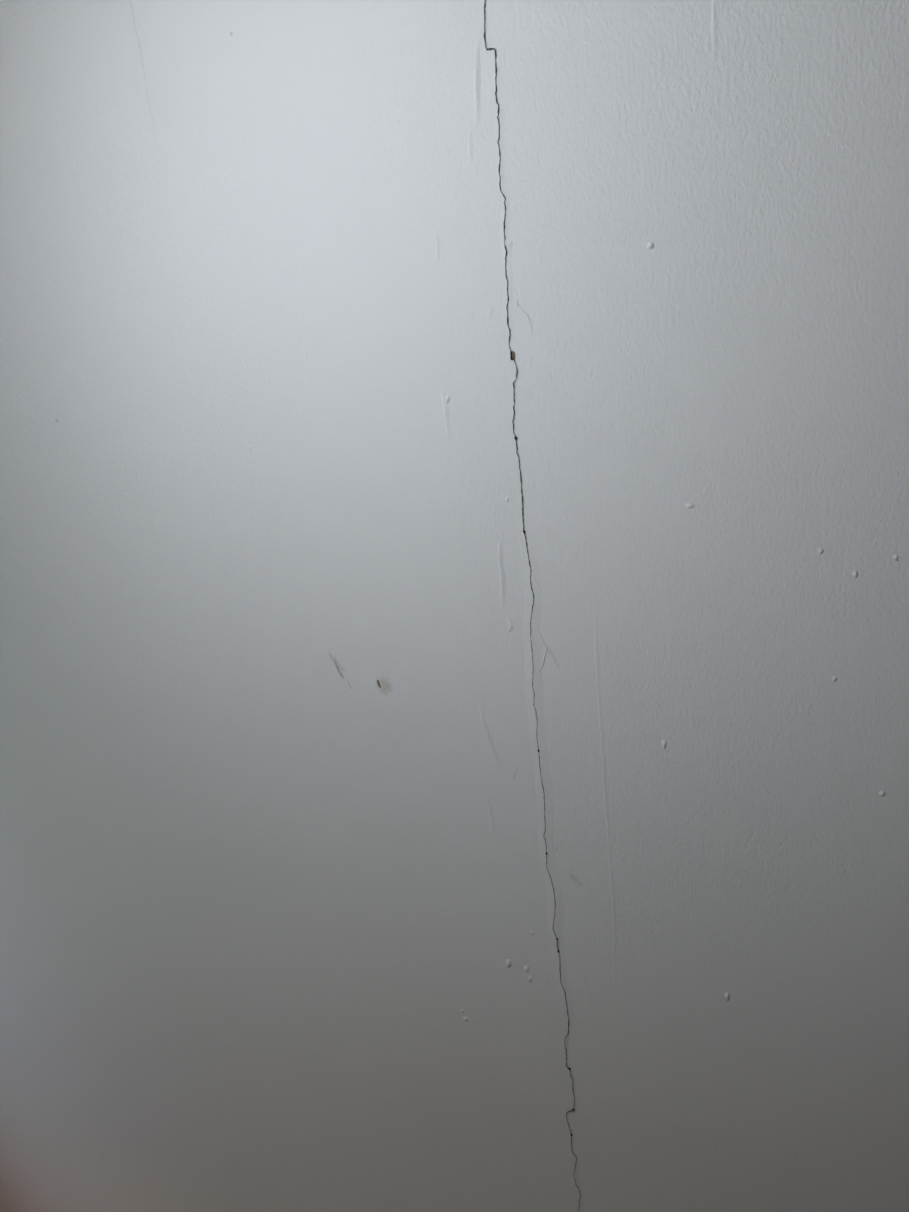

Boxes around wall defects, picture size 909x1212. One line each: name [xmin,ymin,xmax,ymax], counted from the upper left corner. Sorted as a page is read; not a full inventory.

crack [484,0,581,1212]